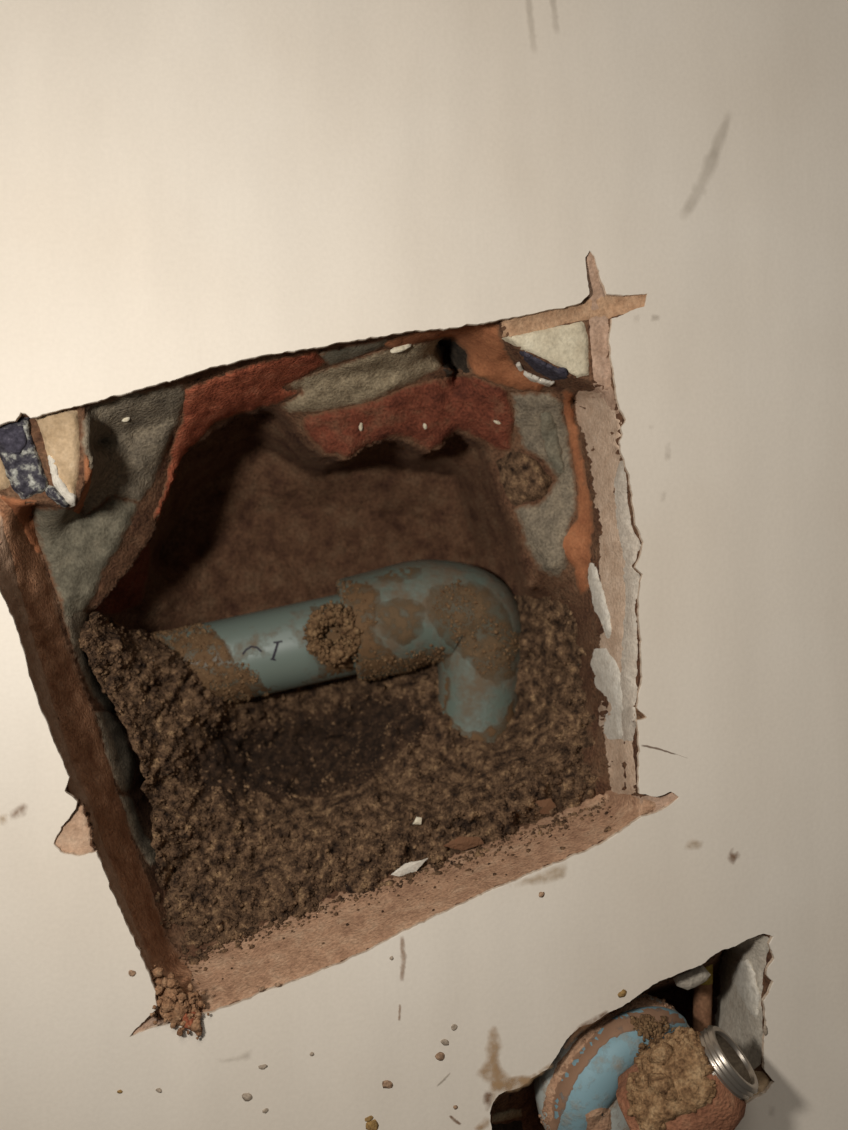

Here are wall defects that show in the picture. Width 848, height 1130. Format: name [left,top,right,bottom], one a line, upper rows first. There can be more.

spalling [0,404,92,508]
spalling [87,320,649,802]
spalling [43,560,218,962]
spalling [567,934,772,1040]
spalling [490,1074,545,1130]